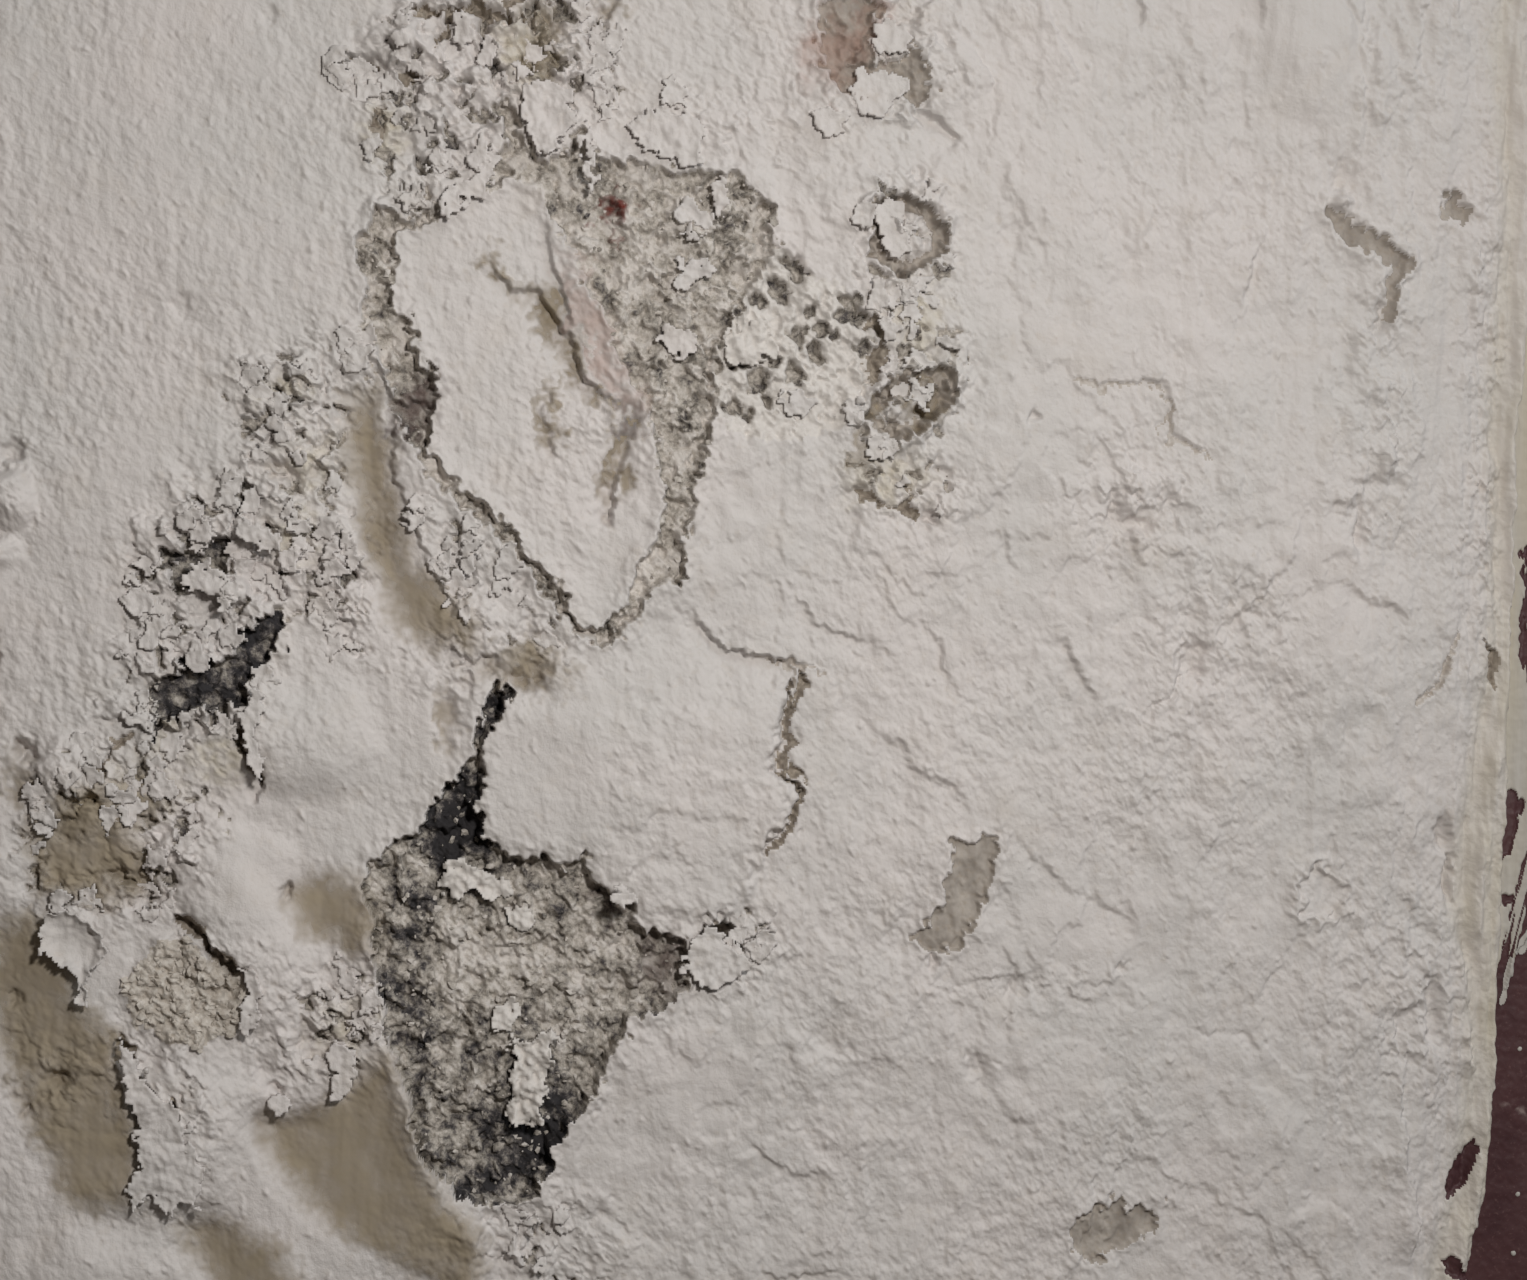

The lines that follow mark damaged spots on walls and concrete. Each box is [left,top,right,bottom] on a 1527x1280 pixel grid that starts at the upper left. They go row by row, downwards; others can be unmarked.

flaking render [8,0,980,1275]
spalling [1518,545,1527,673]
crack [753,652,826,857]
spalling [1502,789,1526,860]
peeling [909,833,1001,955]
spalling [1501,894,1515,907]
peeling [1069,1193,1167,1265]
spalling [1445,1138,1480,1200]